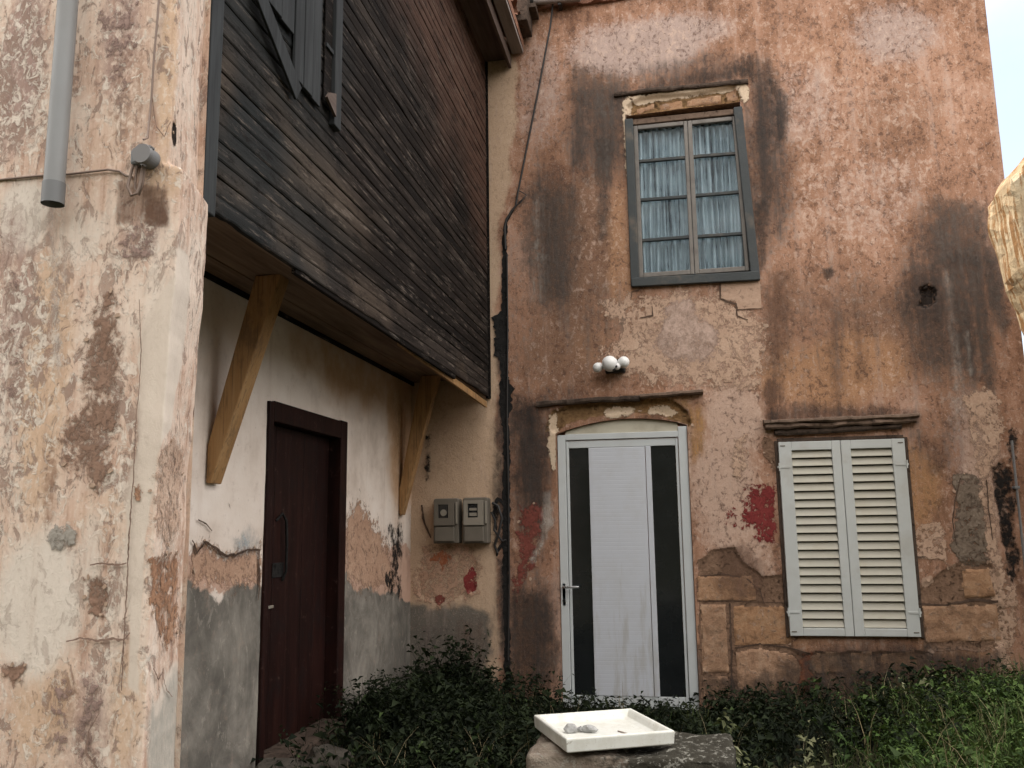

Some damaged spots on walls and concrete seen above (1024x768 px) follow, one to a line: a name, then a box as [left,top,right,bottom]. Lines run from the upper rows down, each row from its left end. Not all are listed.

spalling [622,84,750,176]
damp [678,56,788,178]
crack [719,284,762,320]
peeling [49,288,123,494]
peeling [545,285,779,471]
peeling [133,437,263,651]
peeling [345,489,398,593]
peeling [463,567,477,594]
peeling [510,502,553,602]
peeling [726,483,779,543]
spalling [696,522,1009,701]
damp [989,427,1020,582]